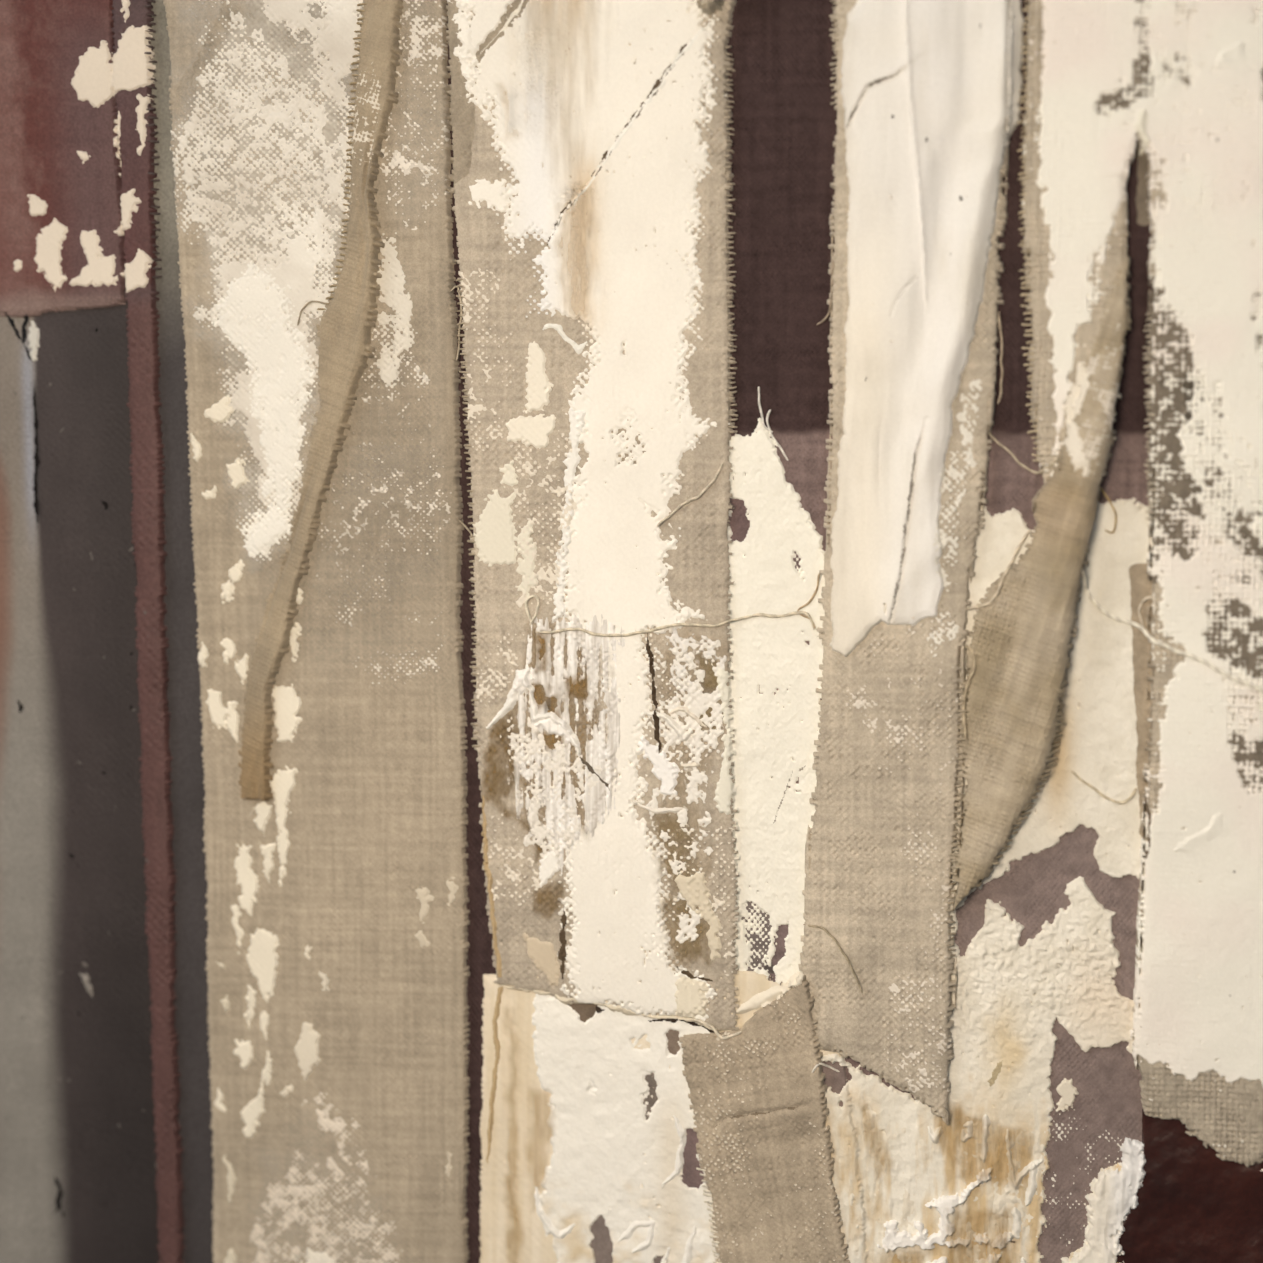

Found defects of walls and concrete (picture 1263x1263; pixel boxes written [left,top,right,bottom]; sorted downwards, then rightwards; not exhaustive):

peeling [71,0,156,177]
peeling [13,188,153,293]
peeling [727,498,750,542]
peeling [205,689,239,743]
peeling [271,684,302,742]
peeling [487,716,602,907]
peeling [214,766,403,1263]
peeling [570,1003,598,1022]
peeling [637,627,815,1261]
spalling [883,813,1143,1095]
spalling [786,1017,1263,1263]
peeling [590,1215,613,1263]